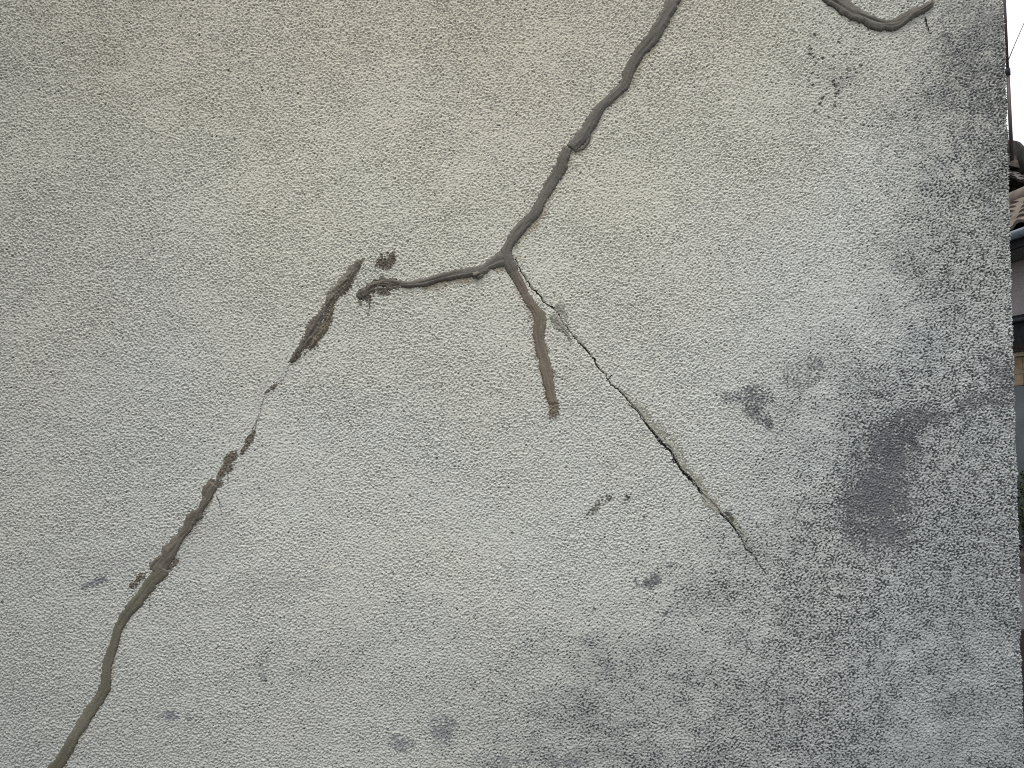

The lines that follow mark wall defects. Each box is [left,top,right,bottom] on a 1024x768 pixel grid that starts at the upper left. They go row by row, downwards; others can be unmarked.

crack [822,0,934,37]
crack [47,0,766,768]
leakage [721,385,775,429]
leakage [835,406,952,559]